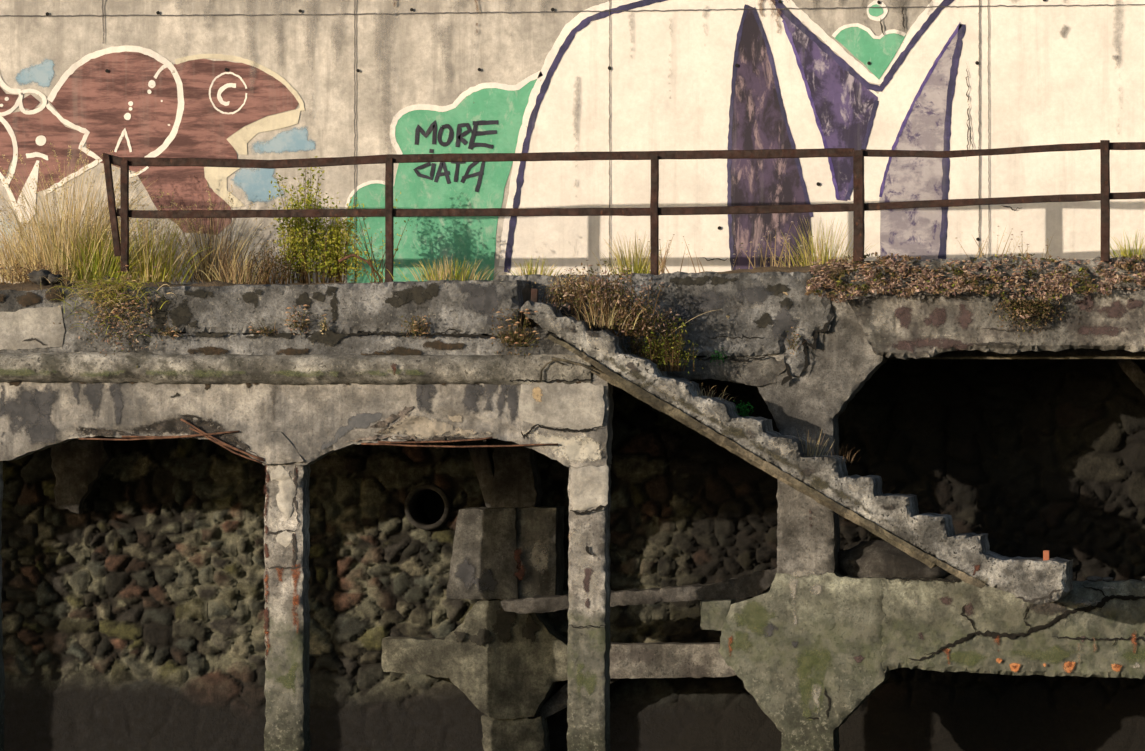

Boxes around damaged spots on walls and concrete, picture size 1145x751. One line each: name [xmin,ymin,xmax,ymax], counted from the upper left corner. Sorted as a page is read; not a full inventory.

crack [697,314,876,385]
damp [0,368,59,444]
damp [71,371,124,424]
damp [369,369,436,413]
damp [462,384,519,425]
crack [510,376,594,384]
spalling [68,414,247,451]
damp [321,413,382,450]
crack [520,424,603,439]
rust [264,465,300,656]
crack [886,577,1145,661]
rust [994,638,1020,672]